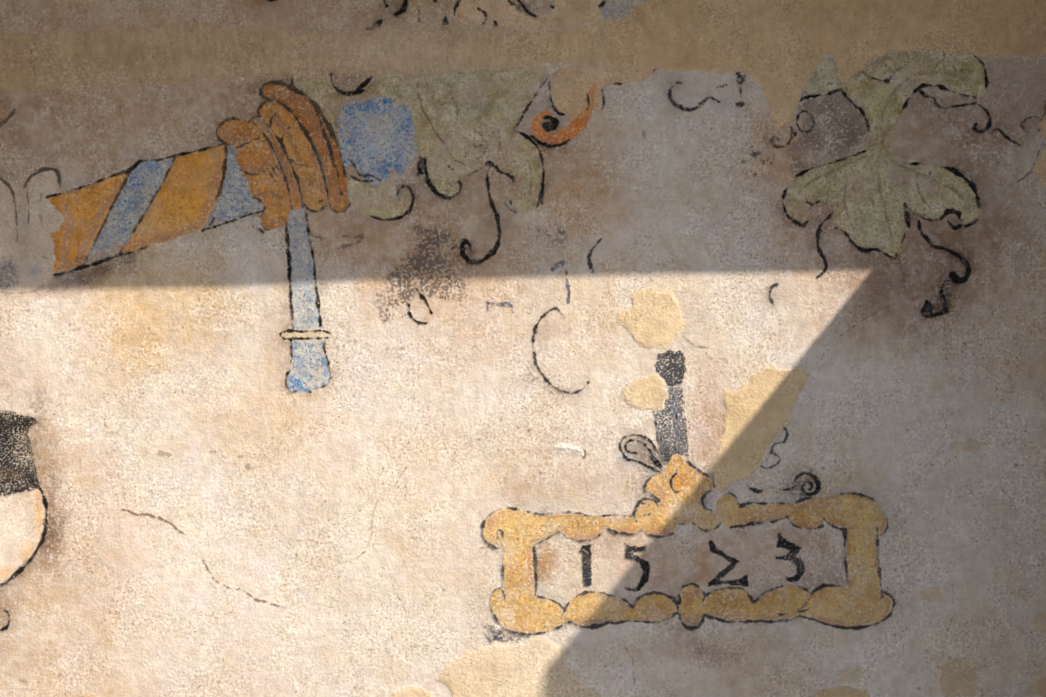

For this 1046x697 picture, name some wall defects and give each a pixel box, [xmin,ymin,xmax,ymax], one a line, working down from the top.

crack [122,509,184,534]
crack [203,559,285,608]